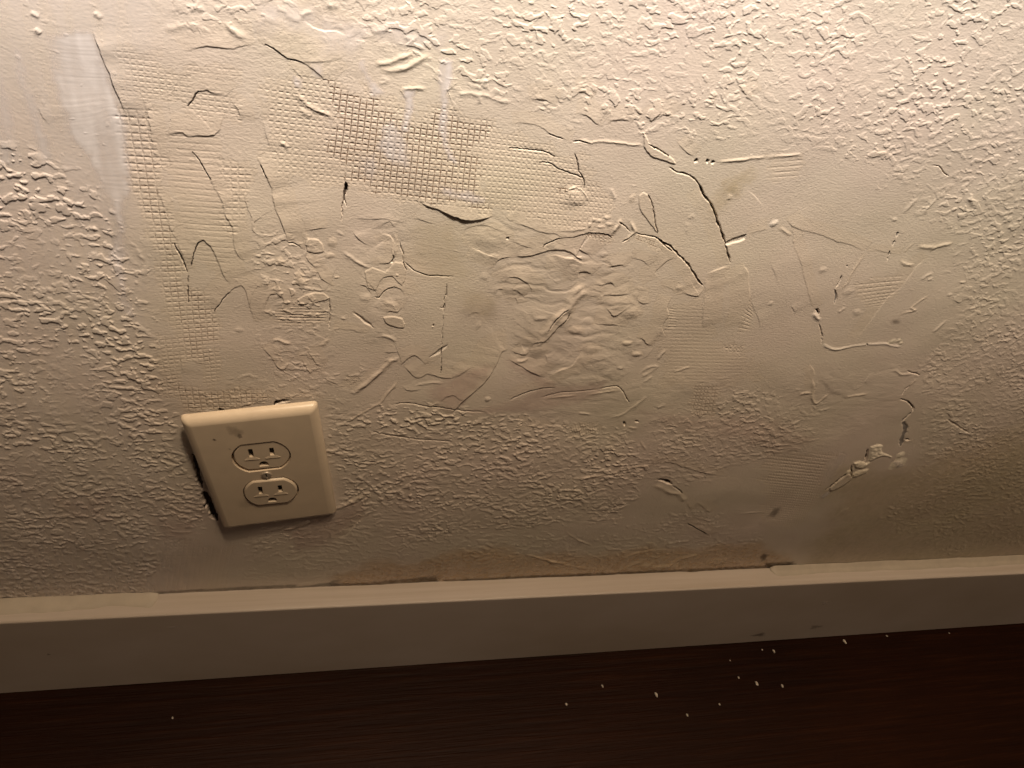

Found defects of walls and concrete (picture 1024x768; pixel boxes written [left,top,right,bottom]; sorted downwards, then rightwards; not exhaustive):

crack [164,13,349,85]
crack [157,189,197,302]
crack [256,151,306,250]
crack [341,181,349,214]
crack [400,246,451,371]
crack [509,110,803,296]
crack [790,227,904,351]
crack [899,379,917,446]
spalling [829,444,907,491]